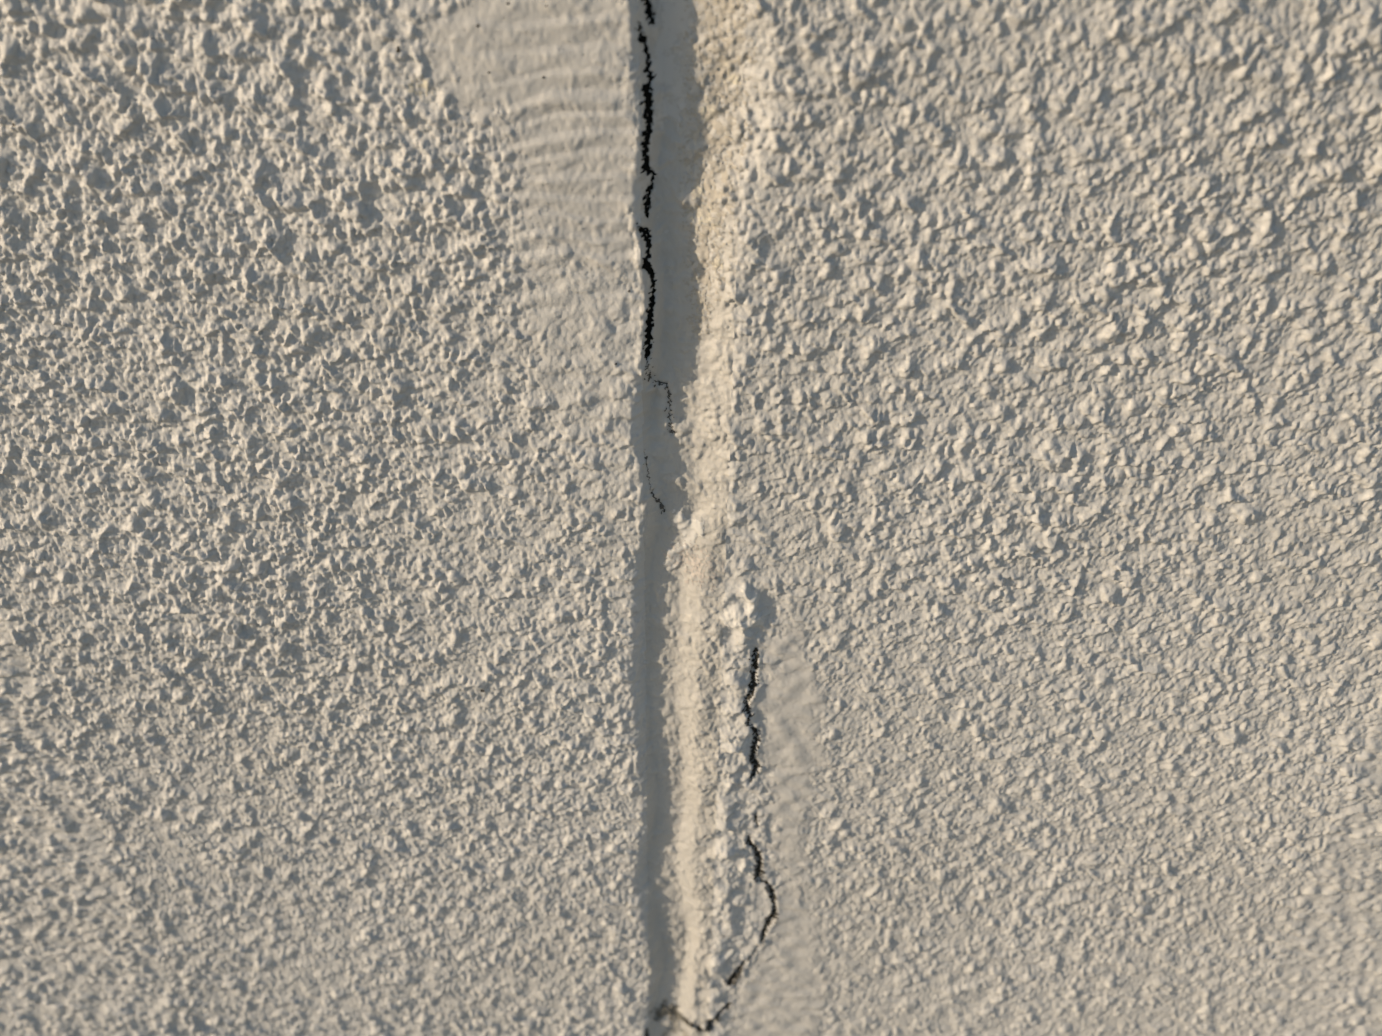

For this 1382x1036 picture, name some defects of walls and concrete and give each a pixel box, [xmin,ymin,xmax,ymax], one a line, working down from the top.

crack [635,0,677,515]
crack [683,648,779,1033]